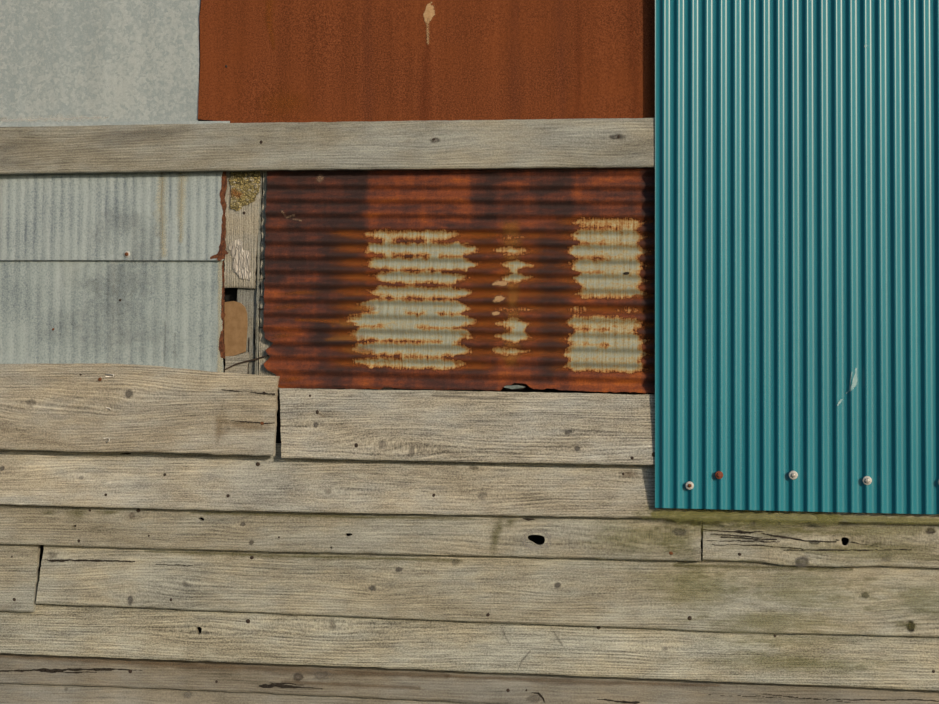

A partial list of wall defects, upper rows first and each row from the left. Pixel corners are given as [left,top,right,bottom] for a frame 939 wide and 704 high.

rust [210,172,228,358]
damp [651,509,939,524]
crack [703,529,907,551]
crack [0,666,143,674]